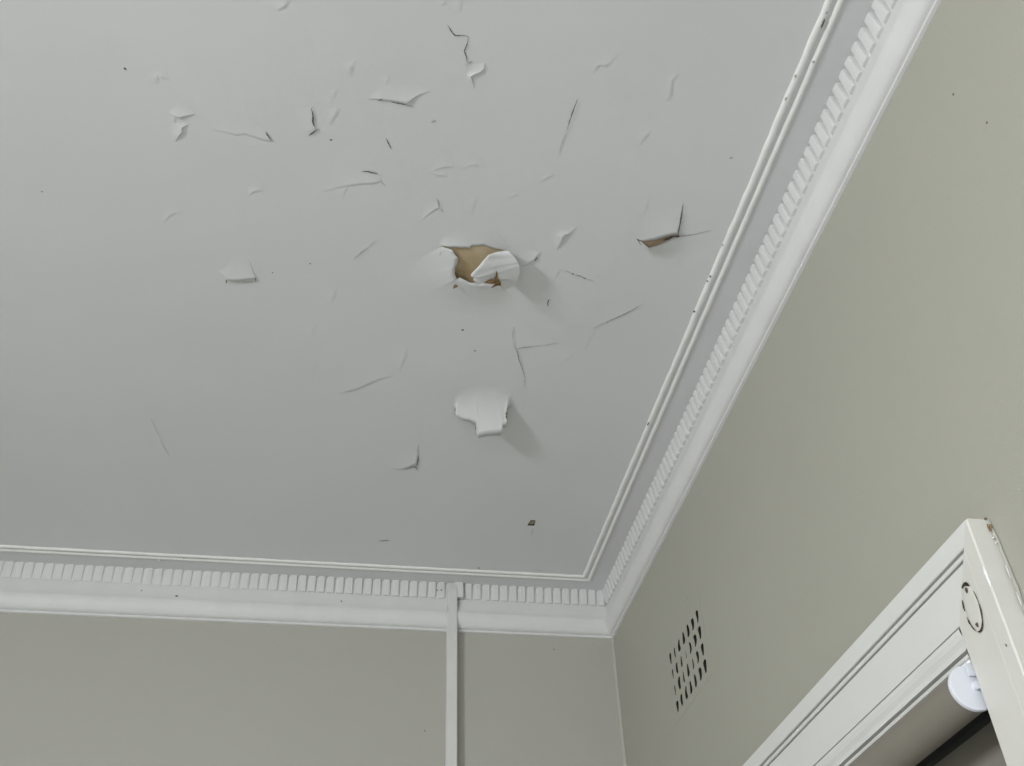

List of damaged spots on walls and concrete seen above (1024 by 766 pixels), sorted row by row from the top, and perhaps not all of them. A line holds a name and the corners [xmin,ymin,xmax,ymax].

crack [213,106,319,142]
crack [320,167,382,199]